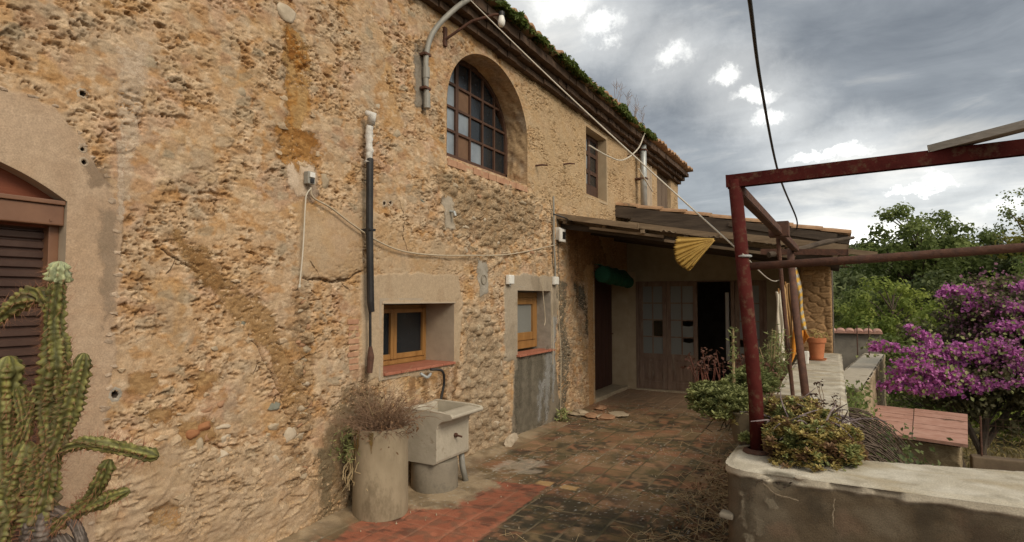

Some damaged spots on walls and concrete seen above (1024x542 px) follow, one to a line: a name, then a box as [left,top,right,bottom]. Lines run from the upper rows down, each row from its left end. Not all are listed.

crack [302,260,361,289]
damp [511,240,588,434]